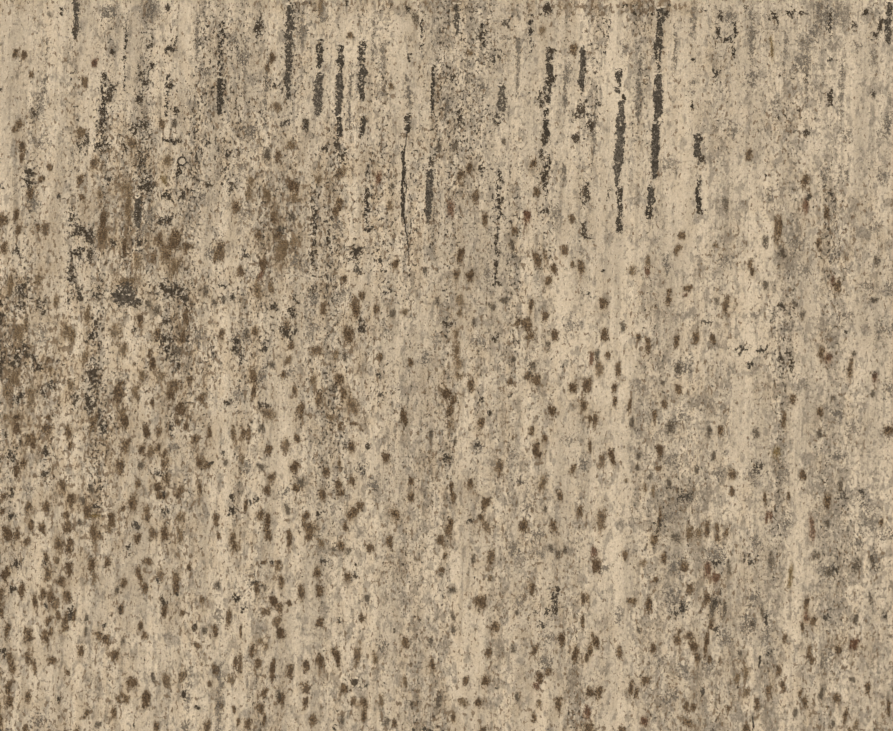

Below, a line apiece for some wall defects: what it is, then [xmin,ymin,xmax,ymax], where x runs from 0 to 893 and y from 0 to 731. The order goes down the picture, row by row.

damp [99,0,121,21]
damp [226,34,250,94]
damp [240,54,270,145]
damp [371,18,385,78]
damp [563,62,573,113]
damp [633,59,645,125]
crack [401,132,409,255]